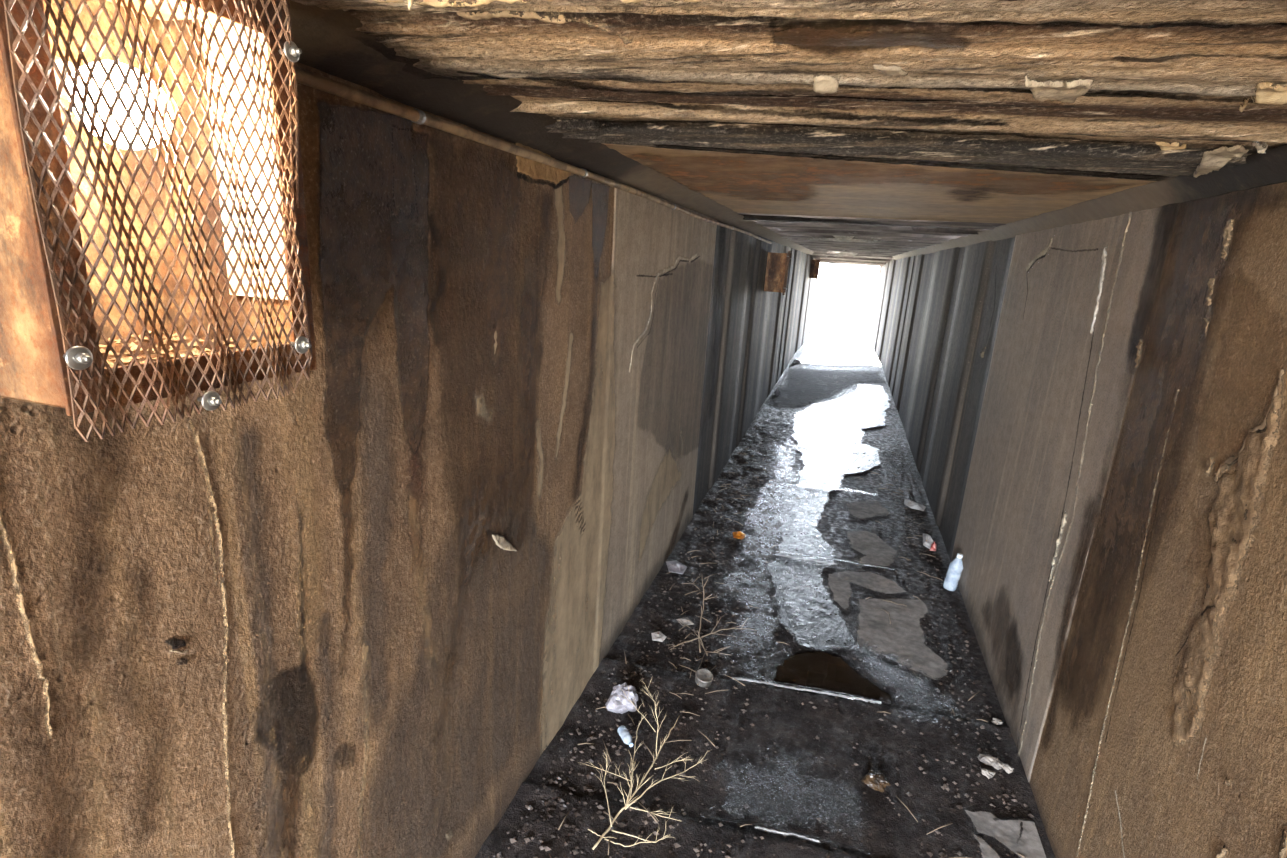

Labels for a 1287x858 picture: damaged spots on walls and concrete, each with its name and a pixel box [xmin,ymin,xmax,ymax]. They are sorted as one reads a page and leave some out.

peeling [813,75,839,94]
peeling [1025,75,1093,103]
peeling [1155,142,1186,150]
peeling [1193,141,1268,178]
peeling [1239,82,1287,112]
leakage [0,514,74,858]
leakage [68,408,119,663]
leakage [189,419,229,664]
leakage [256,508,335,858]
leakage [317,100,616,858]
leakage [1043,187,1283,748]
spalling [1171,369,1287,744]